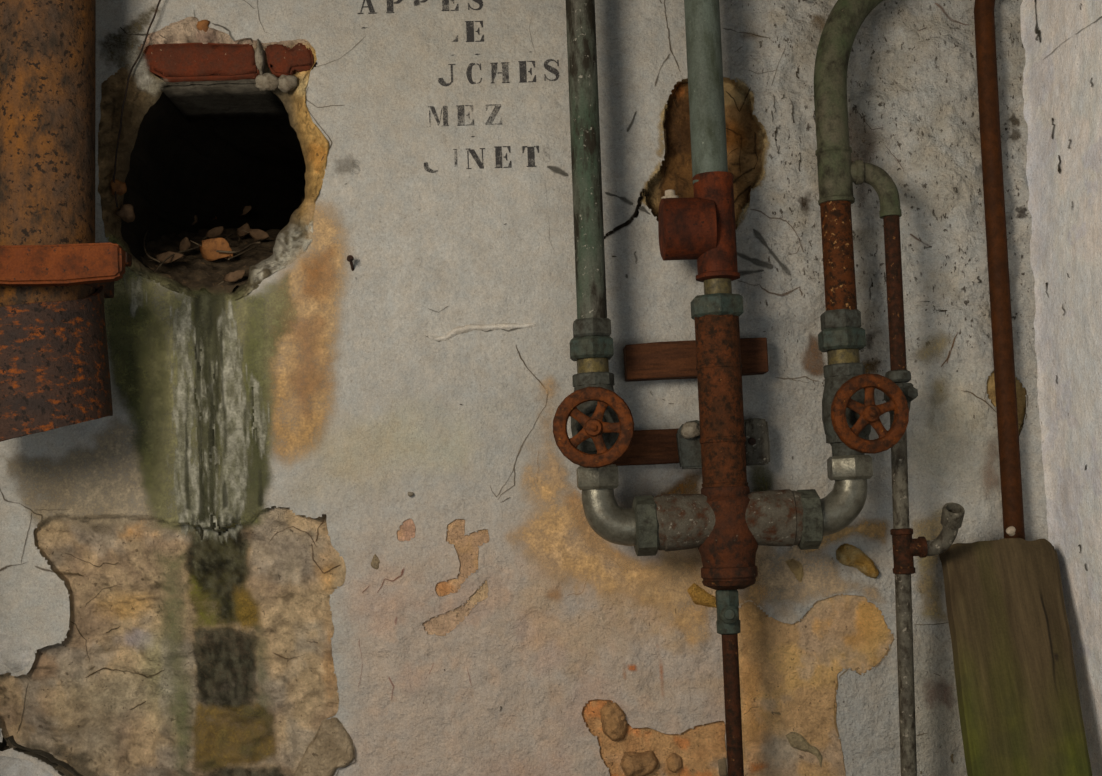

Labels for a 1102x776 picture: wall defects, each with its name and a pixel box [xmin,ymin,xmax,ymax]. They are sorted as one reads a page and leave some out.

crack [655,0,681,86]
crack [723,28,786,86]
hole [98,17,330,300]
flaking render [605,78,694,221]
flaking render [723,77,769,229]
rust [268,208,344,459]
leakage [8,294,269,746]
crack [0,686,82,776]
flaking render [0,506,356,776]
mould [208,767,283,776]
peeling [582,699,728,776]
peeling [738,594,894,776]